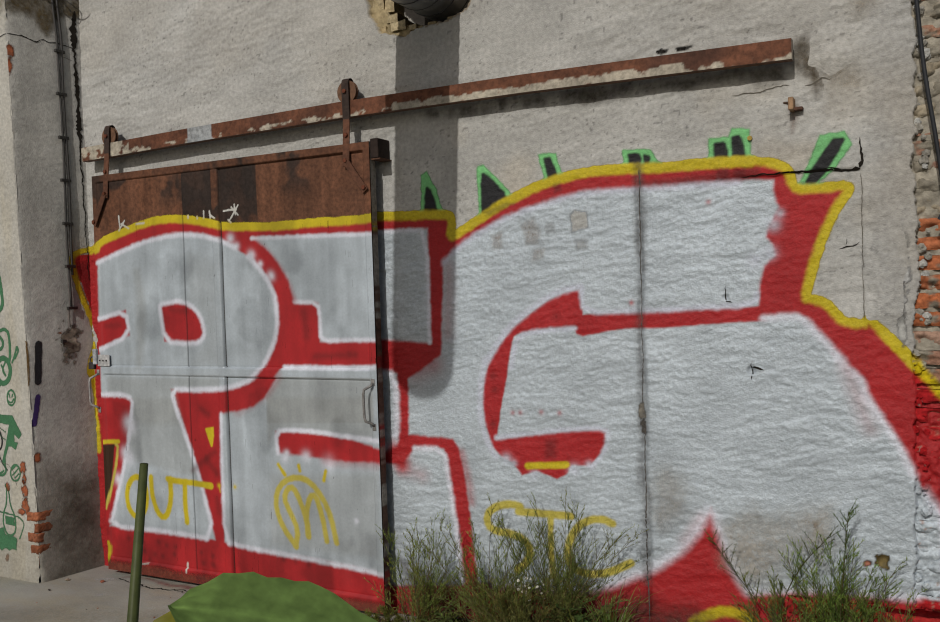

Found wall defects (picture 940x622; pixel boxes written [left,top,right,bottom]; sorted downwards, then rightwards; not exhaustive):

spalling [373,0,454,34]
crack [0,11,90,277]
crack [743,138,865,318]
spalling [897,0,940,610]
spalling [6,452,53,566]